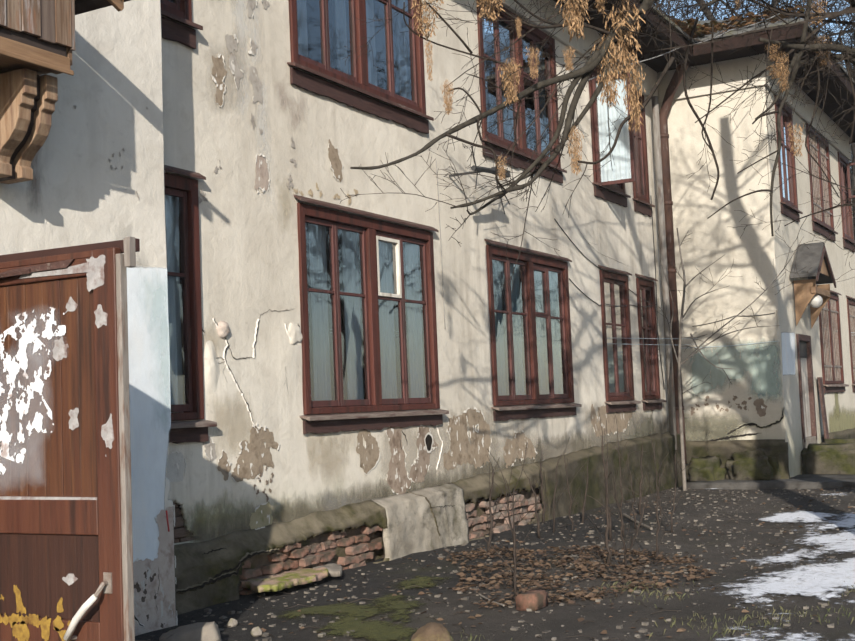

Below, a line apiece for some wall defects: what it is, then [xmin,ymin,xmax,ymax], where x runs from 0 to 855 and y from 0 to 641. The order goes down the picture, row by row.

flaking render [212,34,263,135]
flaking render [254,153,271,193]
flaking render [328,139,344,182]
crack [202,309,300,433]
flaking render [217,423,280,530]
flaking render [356,407,492,494]
damp [272,415,668,524]
damp [684,415,748,441]
crack [709,407,785,441]
flaking render [133,502,196,636]
crack [155,548,280,607]
flaking render [238,525,382,595]